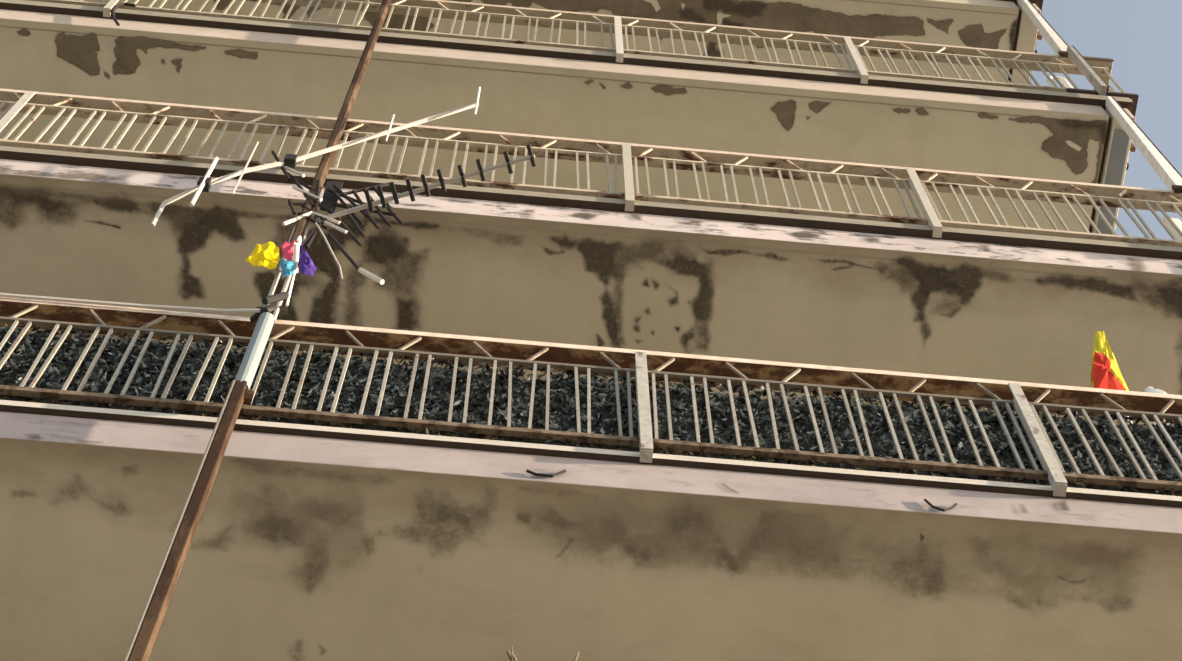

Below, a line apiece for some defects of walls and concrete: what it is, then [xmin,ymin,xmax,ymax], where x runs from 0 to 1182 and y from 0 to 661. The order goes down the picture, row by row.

spalling [214,0,232,10]
spalling [270,3,321,19]
spalling [364,12,434,31]
spalling [453,0,1006,49]
spalling [55,32,206,79]
spalling [707,42,721,57]
spalling [771,100,830,131]
spalling [978,112,1107,184]
leakage [153,204,438,329]
leakage [545,237,731,349]
leakage [879,257,1008,340]
leakage [1037,258,1182,316]